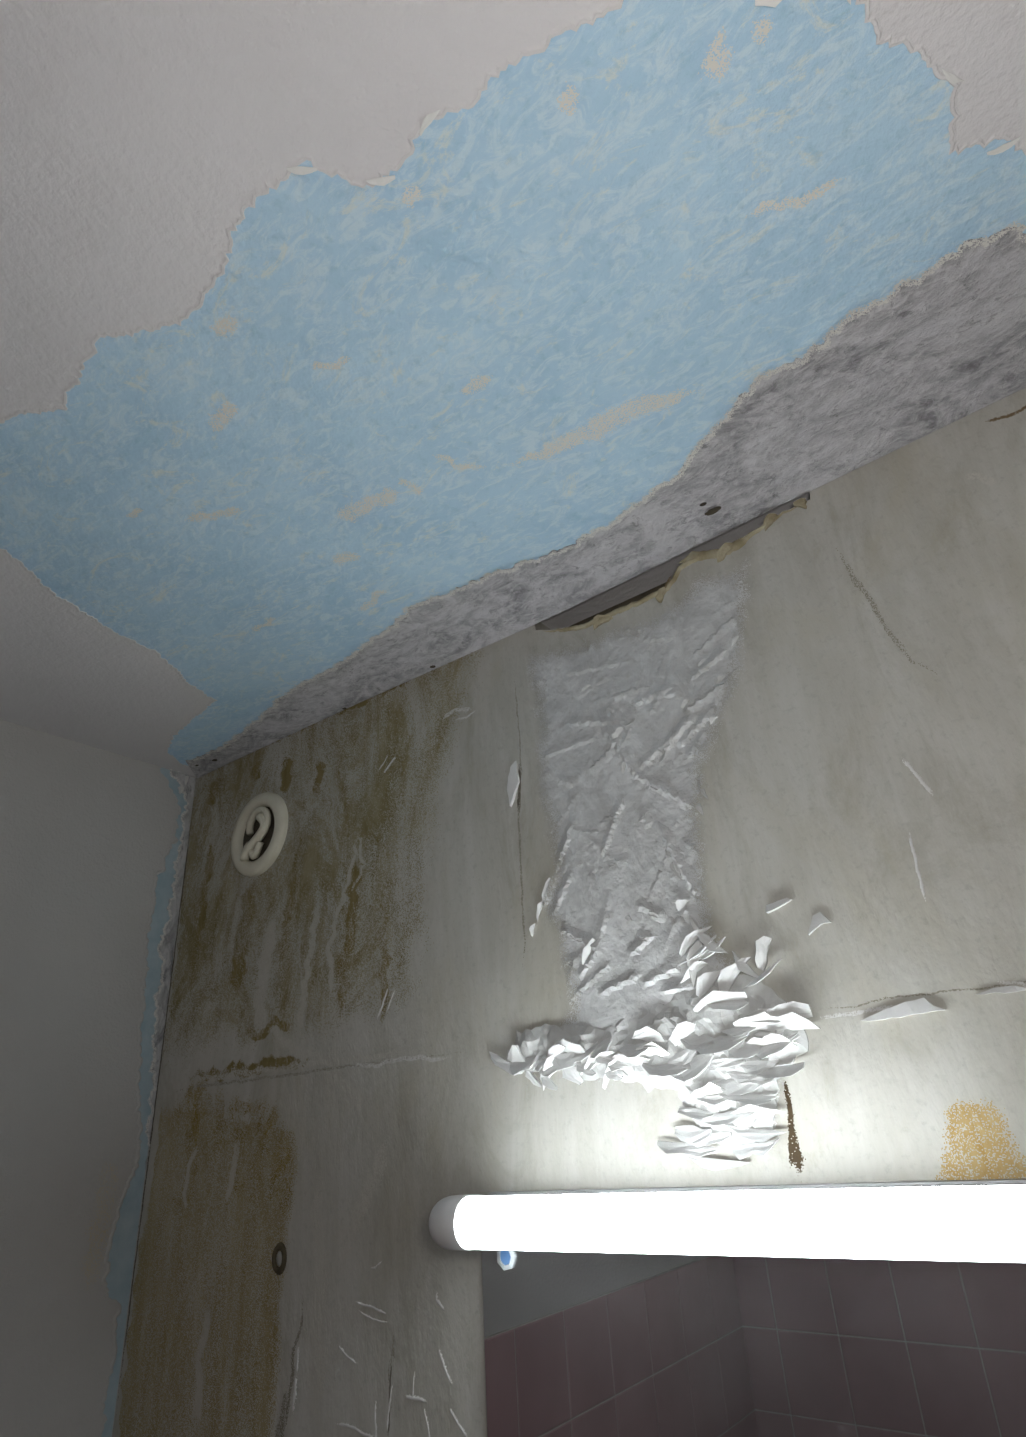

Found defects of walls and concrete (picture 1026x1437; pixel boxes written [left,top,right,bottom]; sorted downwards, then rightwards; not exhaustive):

peeling [0,0,1026,766]
water stain [119,650,484,1437]
flaking render [98,221,1026,1437]
rust [935,1099,1026,1181]